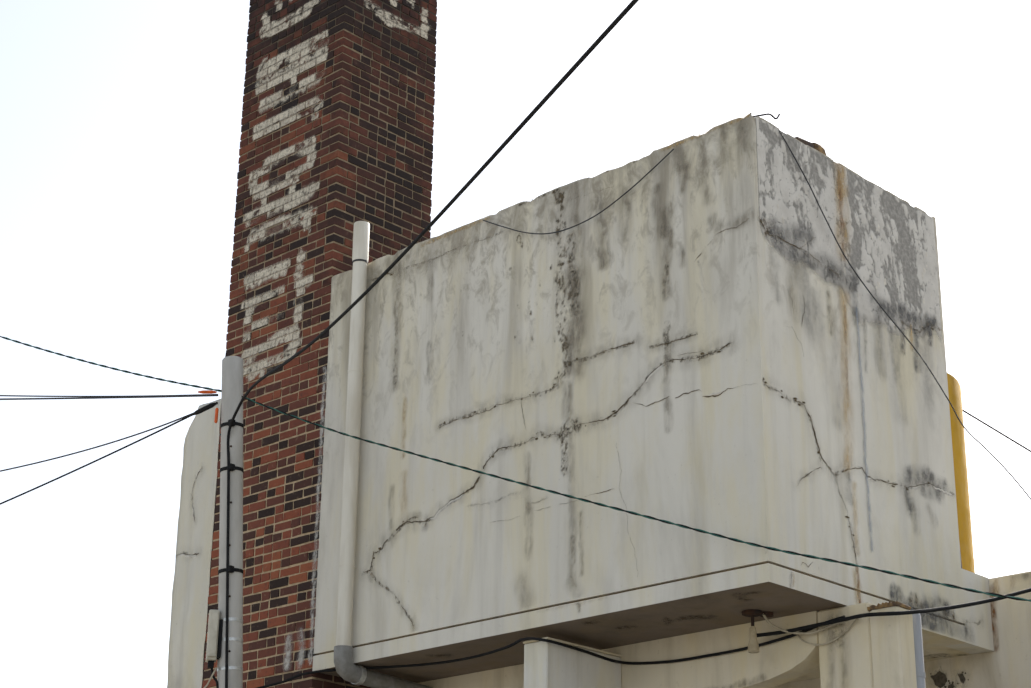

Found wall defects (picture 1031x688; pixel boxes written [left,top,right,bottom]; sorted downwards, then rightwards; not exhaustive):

rust [837,169,846,199]
damp [550,189,582,387]
damp [880,303,936,349]
crack [363,334,953,628]
spalling [930,671,969,688]